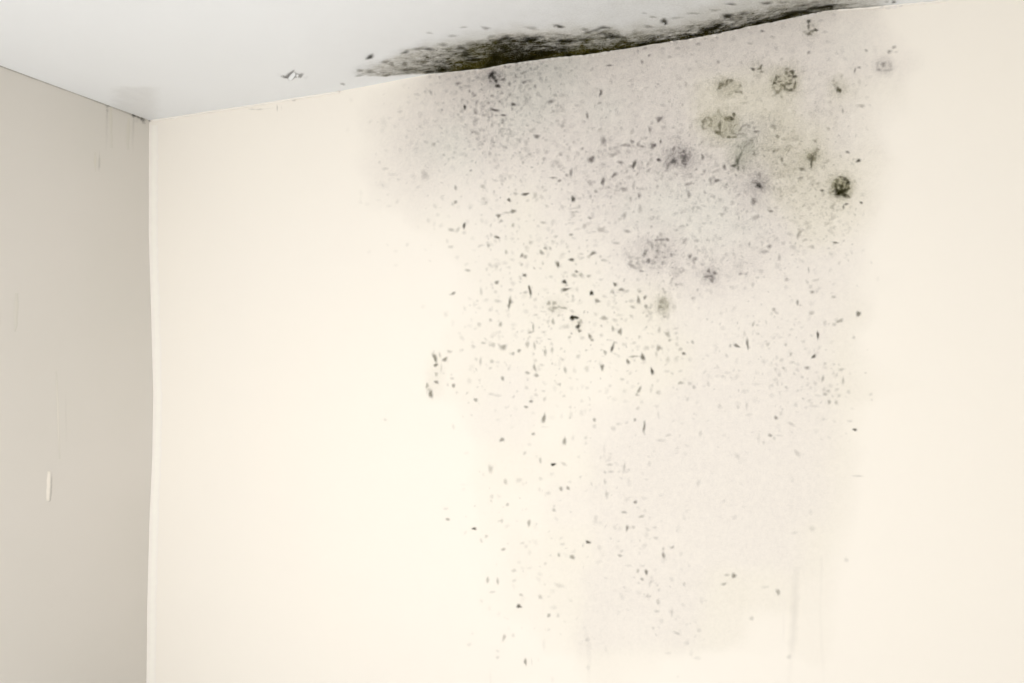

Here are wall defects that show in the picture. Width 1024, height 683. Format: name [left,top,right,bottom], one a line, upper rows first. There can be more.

water stain [391,0,856,87]